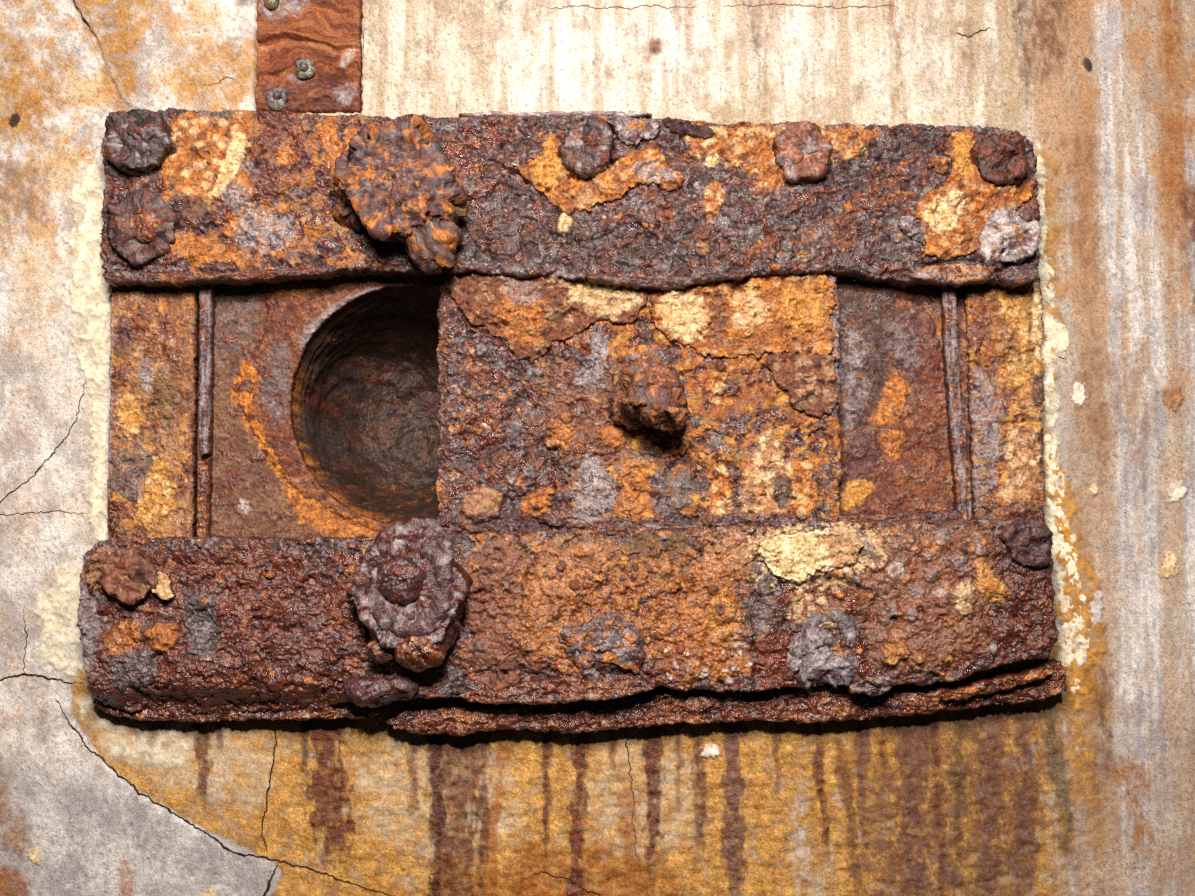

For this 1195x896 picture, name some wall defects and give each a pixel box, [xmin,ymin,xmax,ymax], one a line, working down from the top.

crack [73,0,98,38]
crack [548,2,900,10]
rust [0,35,67,140]
rust [512,114,714,215]
rust [897,127,1035,263]
crack [0,361,93,516]
rust [444,273,839,418]
leakage [1072,382,1086,406]
rust [151,571,176,600]
rust [757,529,865,585]
crack [0,608,395,896]
rust [71,642,1107,896]